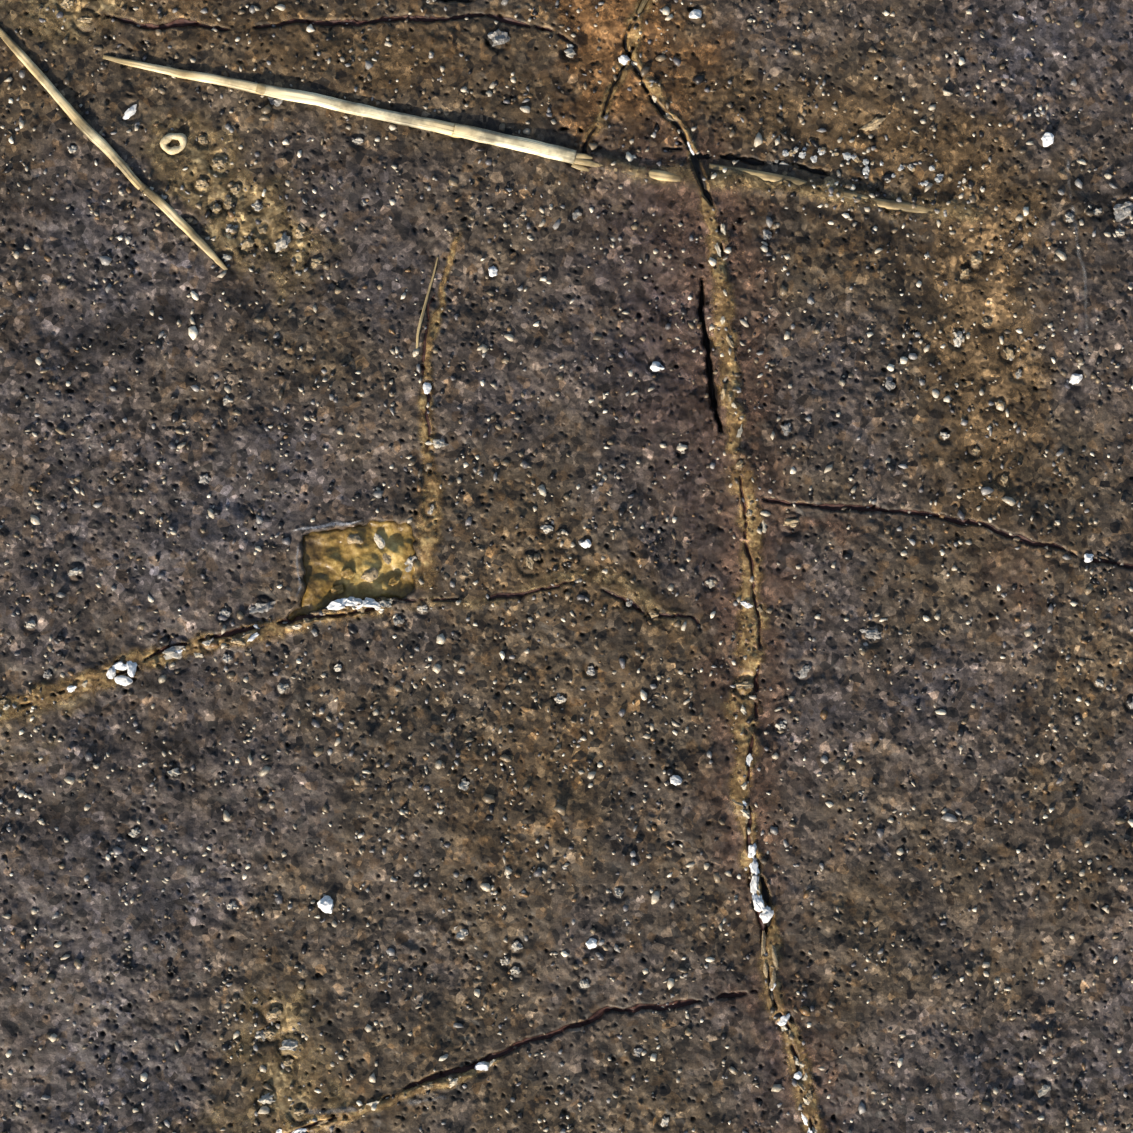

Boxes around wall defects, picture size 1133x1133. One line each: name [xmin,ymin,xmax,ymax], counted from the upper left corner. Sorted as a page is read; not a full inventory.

spalling [287,521,417,621]
crack [272,0,1133,1133]
crack [0,572,699,720]